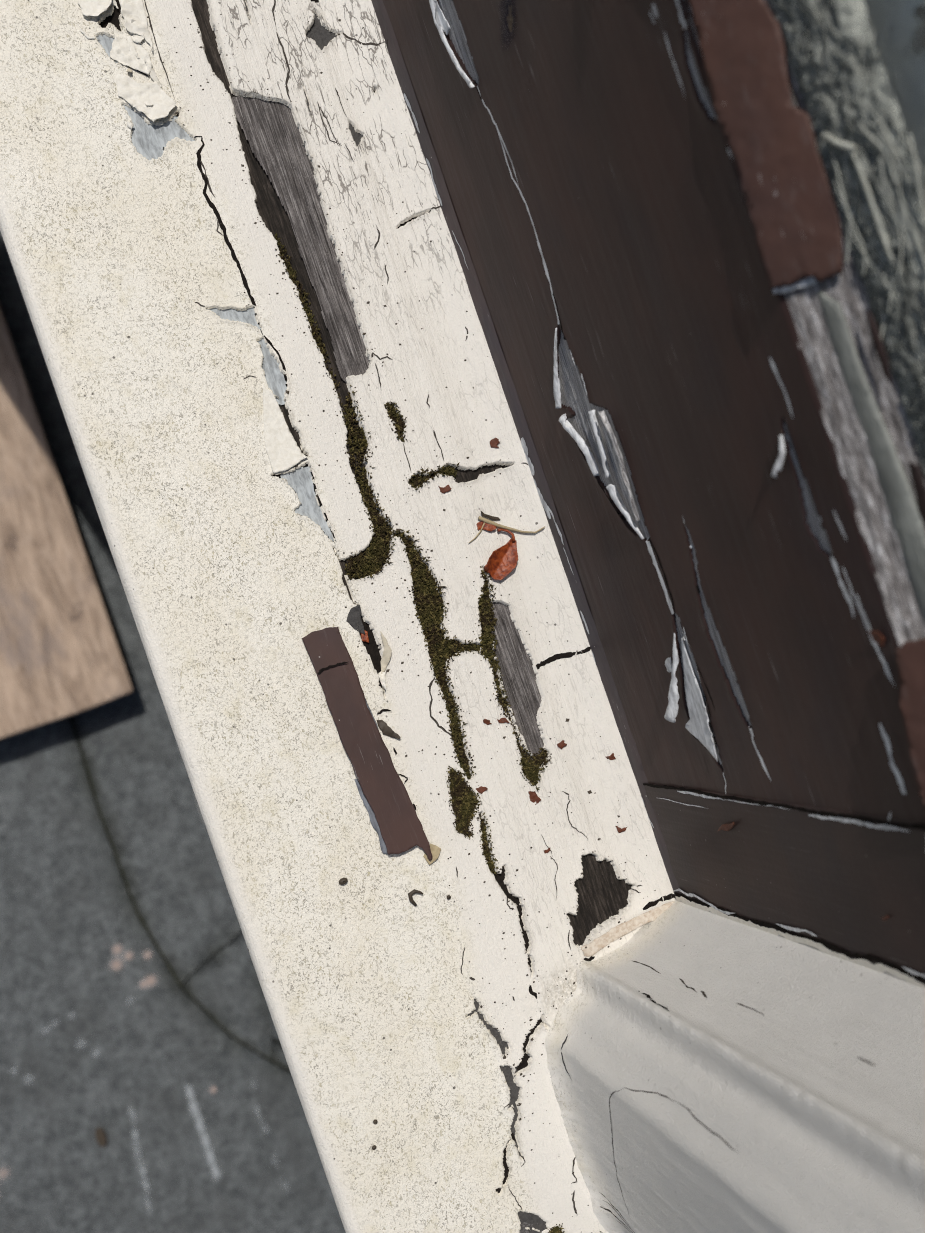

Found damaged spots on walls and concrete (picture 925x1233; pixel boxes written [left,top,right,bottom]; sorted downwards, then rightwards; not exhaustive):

peeling [76,0,196,160]
crack [191,0,395,580]
crack [374,206,441,284]
spalling [772,276,818,294]
crack [406,394,529,492]
peeling [429,0,726,794]
peeling [770,358,895,686]
peeling [682,516,771,781]
crack [562,791,588,839]
crack [643,783,925,832]
peeling [879,723,906,794]
crack [456,812,570,1210]